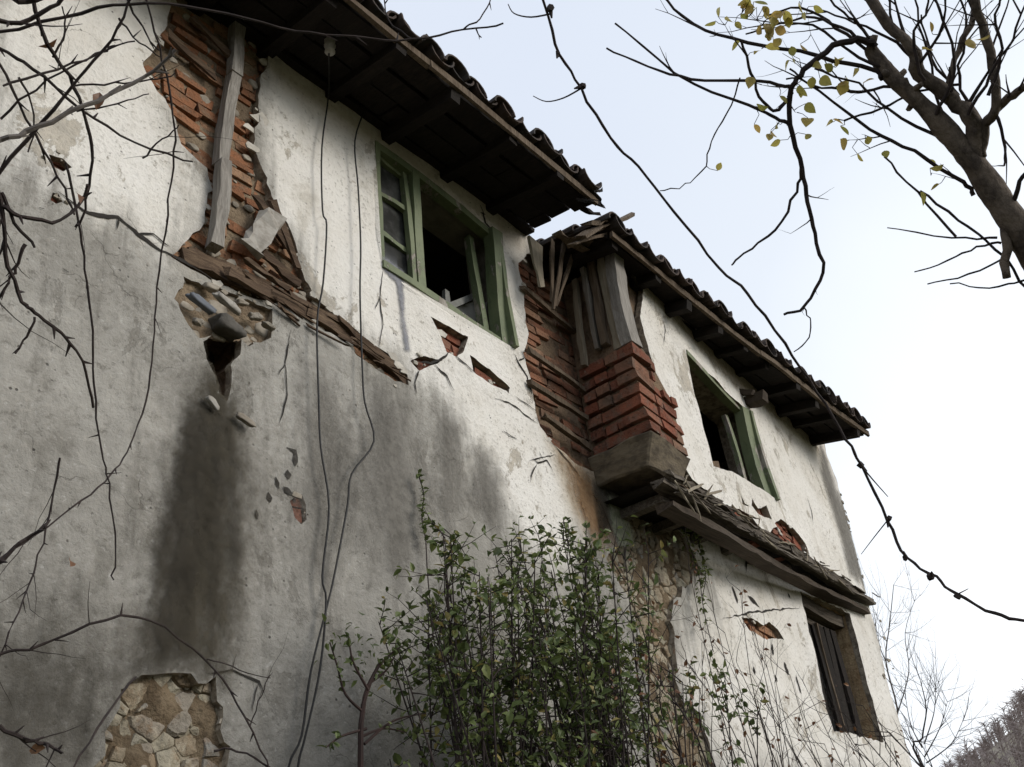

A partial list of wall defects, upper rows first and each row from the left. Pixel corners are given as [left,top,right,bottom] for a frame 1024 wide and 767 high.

flaking render [144,0,434,411]
flaking render [435,325,464,356]
flaking render [473,367,502,389]
crack [496,356,537,439]
flaking render [518,252,592,470]
water stain [157,372,241,666]
flaking render [267,447,309,524]
crack [531,444,577,478]
flaking render [756,509,806,551]
flaking render [732,586,777,673]
flaking render [94,675,233,767]